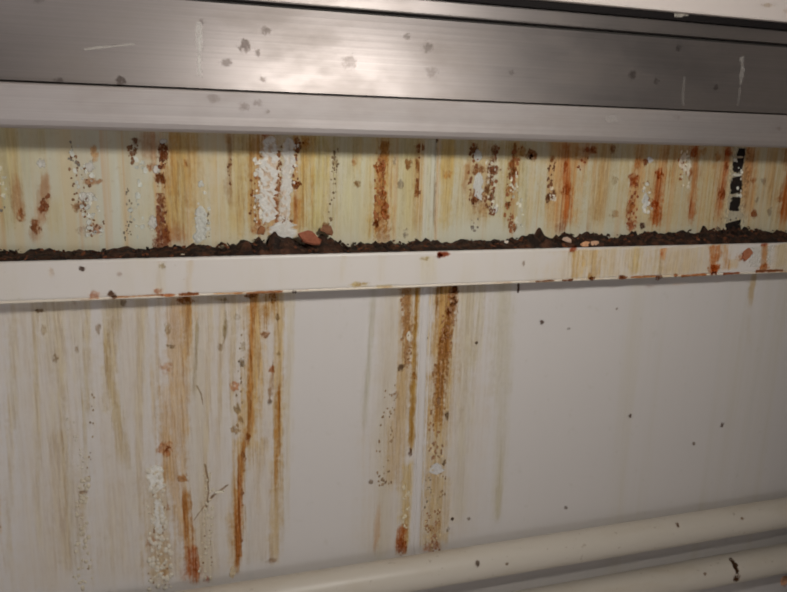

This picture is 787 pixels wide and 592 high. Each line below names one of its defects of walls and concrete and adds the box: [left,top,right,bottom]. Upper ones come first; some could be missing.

corrosion [148,193,170,247]
corrosion [153,139,168,184]
corrosion [292,138,304,189]
corrosion [319,148,339,236]
corrosion [373,159,389,227]
corrosion [467,143,537,233]
corrosion [546,159,557,202]
corrosion [626,176,639,229]
corrosion [725,148,757,230]
corrosion [398,331,412,370]
corrosion [424,286,459,552]